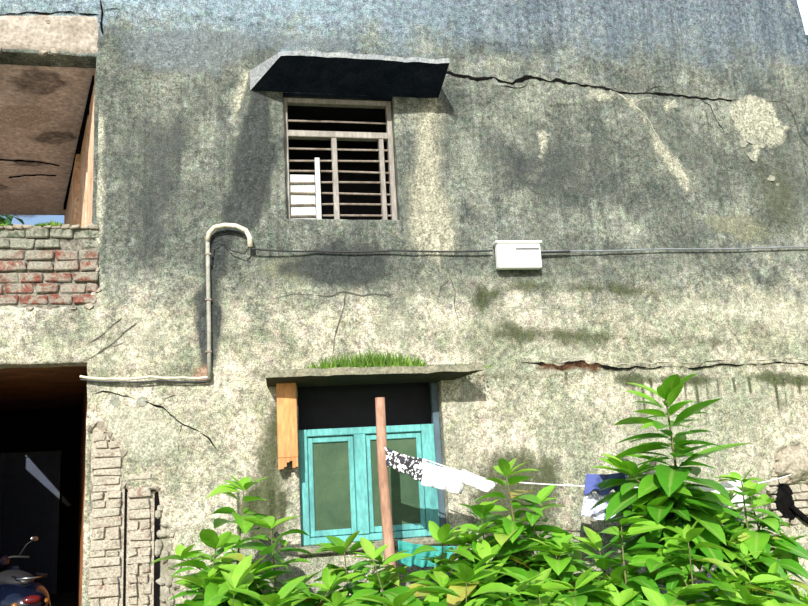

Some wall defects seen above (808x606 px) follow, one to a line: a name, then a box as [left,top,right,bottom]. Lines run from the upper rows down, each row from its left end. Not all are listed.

crack [1,0,122,35]
crack [447,71,741,150]
flaking render [730,96,788,161]
crack [0,159,60,178]
flaking render [0,194,102,311]
crack [516,357,808,387]
crack [91,391,216,451]
flaking render [86,396,186,606]
flaking render [765,441,808,535]